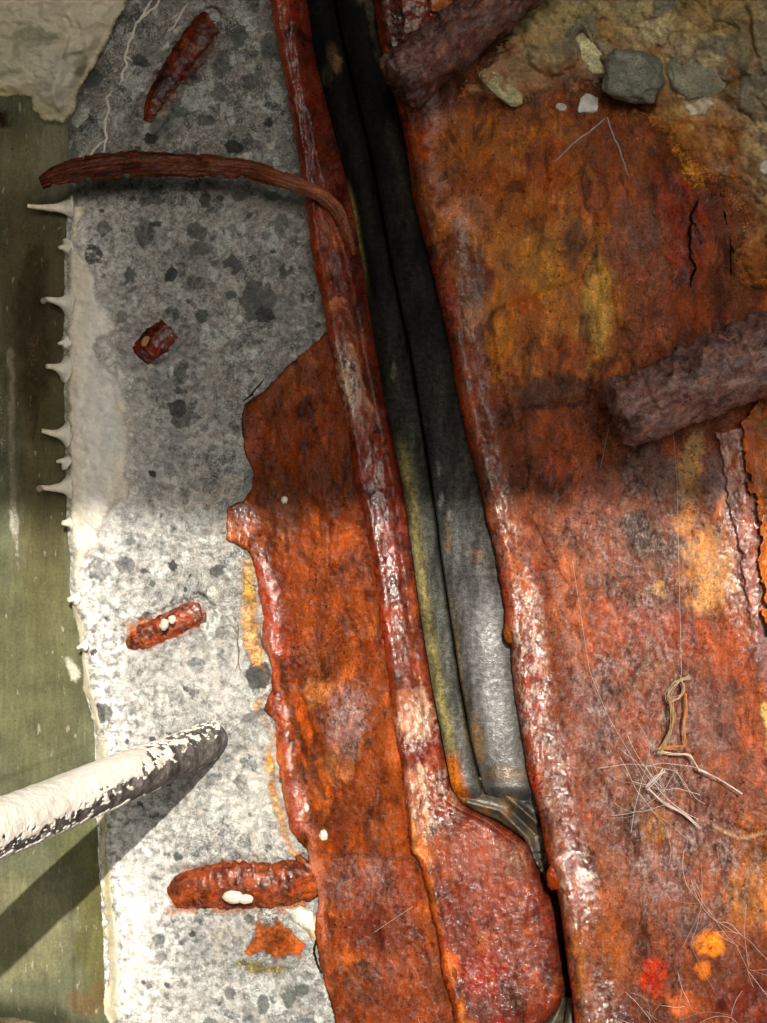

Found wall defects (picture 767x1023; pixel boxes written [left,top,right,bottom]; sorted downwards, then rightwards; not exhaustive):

rust [143,12,219,123]
rust [379,0,546,109]
rust [38,150,356,255]
crack [687,194,734,288]
rust [132,319,178,365]
water stain [16,195,143,760]
rust [603,310,767,631]
rust [125,601,203,650]
rust [241,557,264,669]
rust [167,737,318,915]
water stain [99,814,154,1023]
rust [237,920,305,974]